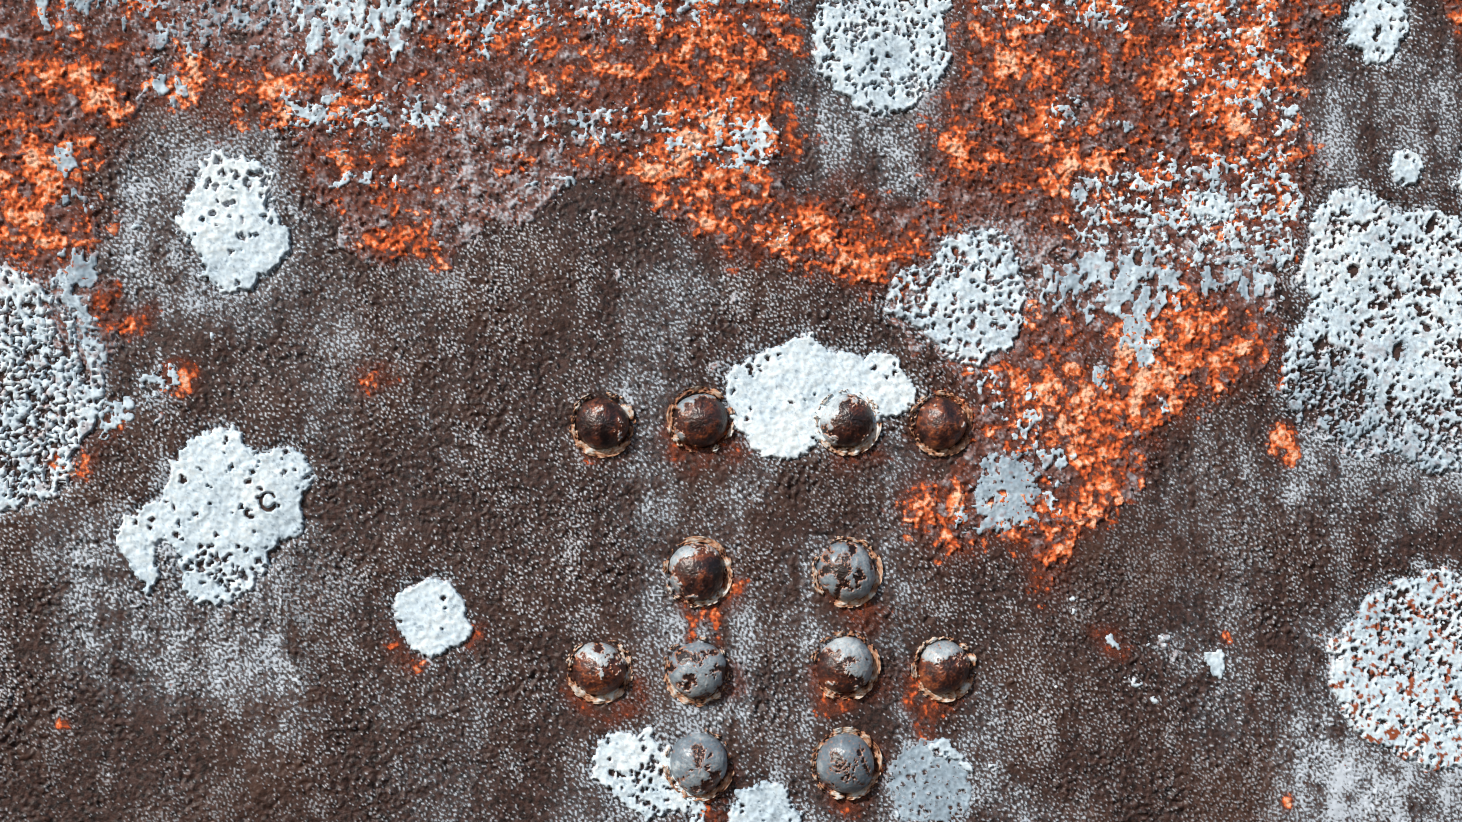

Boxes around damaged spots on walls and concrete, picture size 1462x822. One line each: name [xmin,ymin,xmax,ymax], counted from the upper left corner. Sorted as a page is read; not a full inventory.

rust [1445,0,1462,37]
rust [0,0,1345,609]
rust [677,569,750,644]
rust [560,676,646,723]
rust [691,676,746,704]
rust [808,665,881,719]
rust [899,663,964,741]
rust [700,798,730,822]
rust [829,789,864,820]